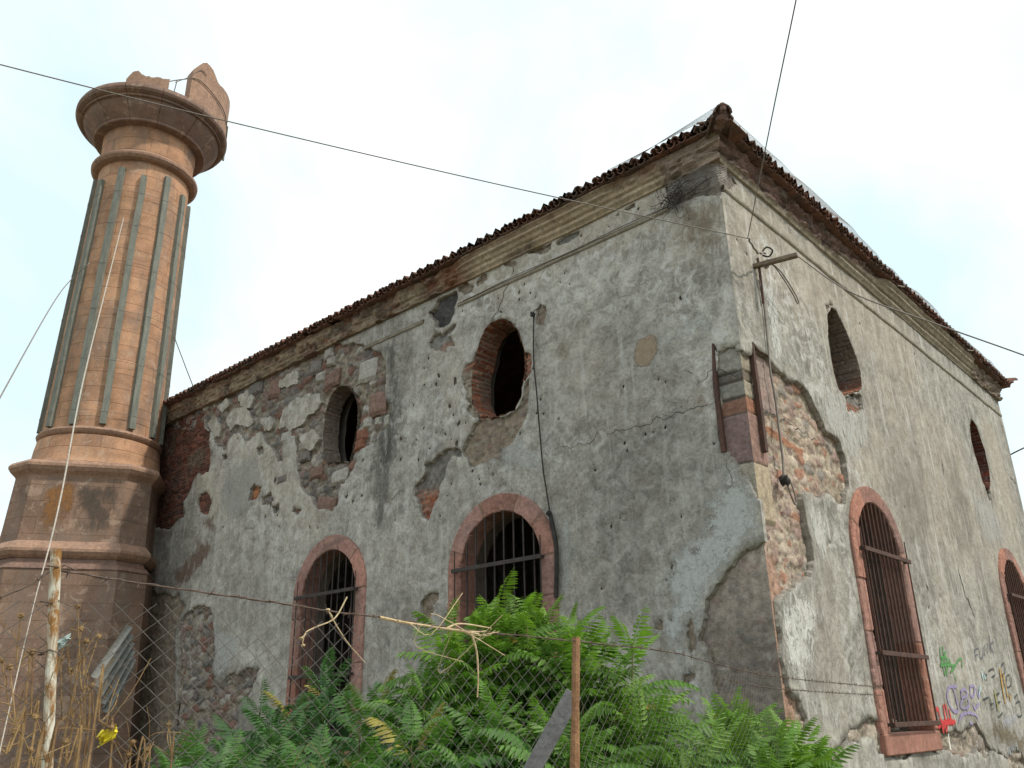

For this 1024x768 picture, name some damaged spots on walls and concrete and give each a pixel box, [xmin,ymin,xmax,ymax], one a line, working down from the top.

spalling [424,273,487,369]
spalling [155,342,402,530]
spalling [414,352,545,520]
crack [552,405,705,451]
damp [79,487,114,528]
spalling [686,346,849,741]
spalling [133,591,260,768]
spalling [832,719,907,763]
spalling [937,724,1024,768]